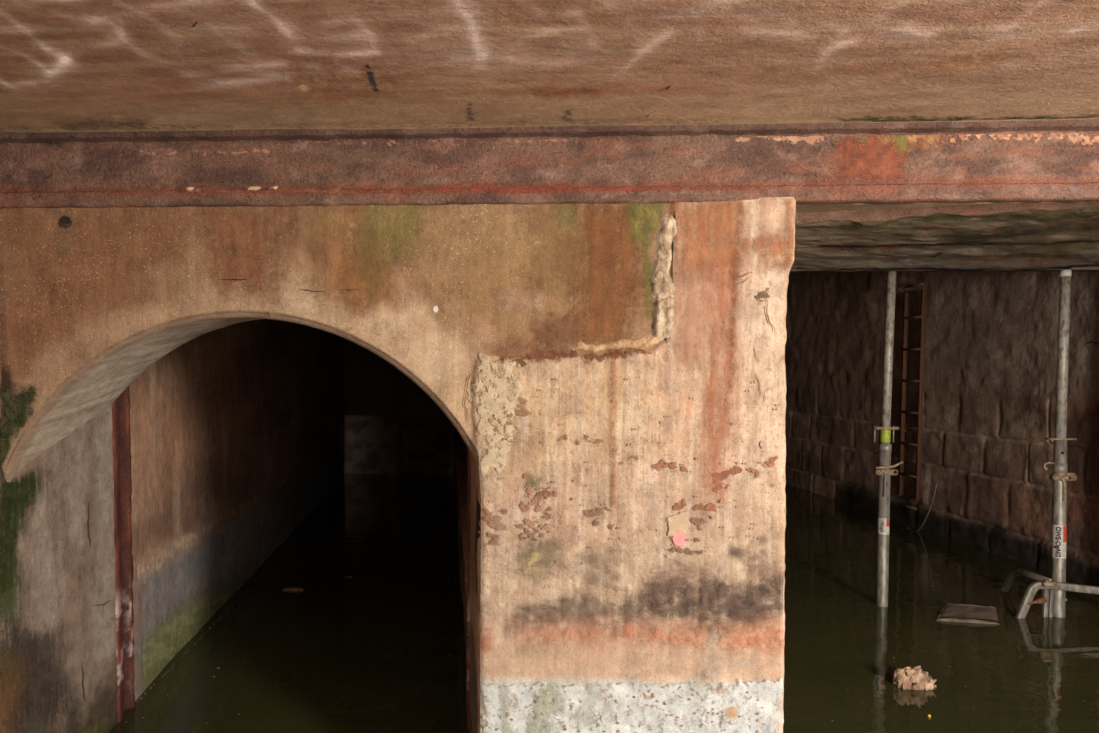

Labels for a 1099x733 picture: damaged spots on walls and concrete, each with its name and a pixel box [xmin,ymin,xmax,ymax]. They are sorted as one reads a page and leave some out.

corrosion [120,141,366,156]
peeling [735,136,824,145]
peeling [870,133,1099,145]
peeling [468,214,699,480]
corrosion [537,203,644,398]
corrosion [671,187,795,500]
damp [1055,411,1099,490]
peeling [483,473,558,567]
peeling [643,455,778,557]
damp [842,483,1052,573]
damp [1066,552,1099,585]
damp [469,538,784,733]